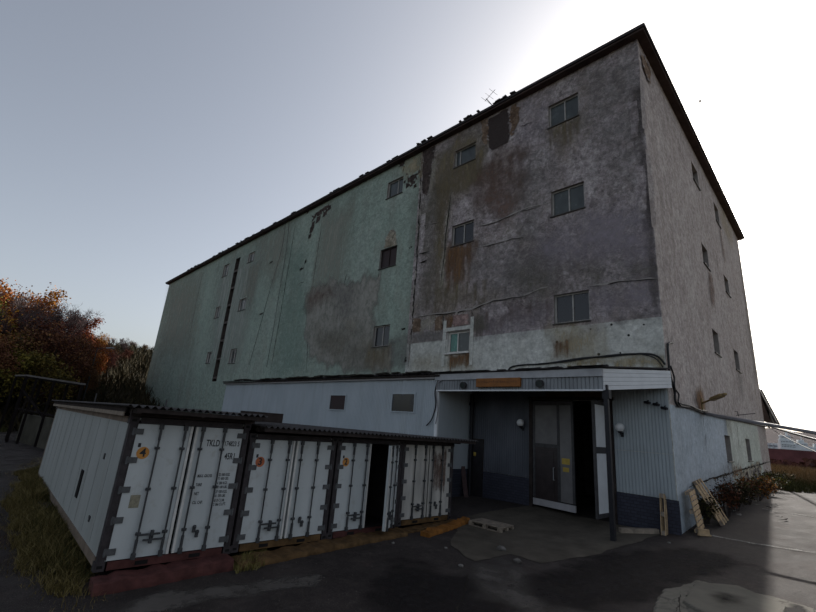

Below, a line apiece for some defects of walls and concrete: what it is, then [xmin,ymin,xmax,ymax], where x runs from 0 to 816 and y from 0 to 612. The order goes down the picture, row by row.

spalling [480,104,521,150]
spalling [398,146,435,195]
peeling [307,203,331,239]
crack [408,155,547,367]